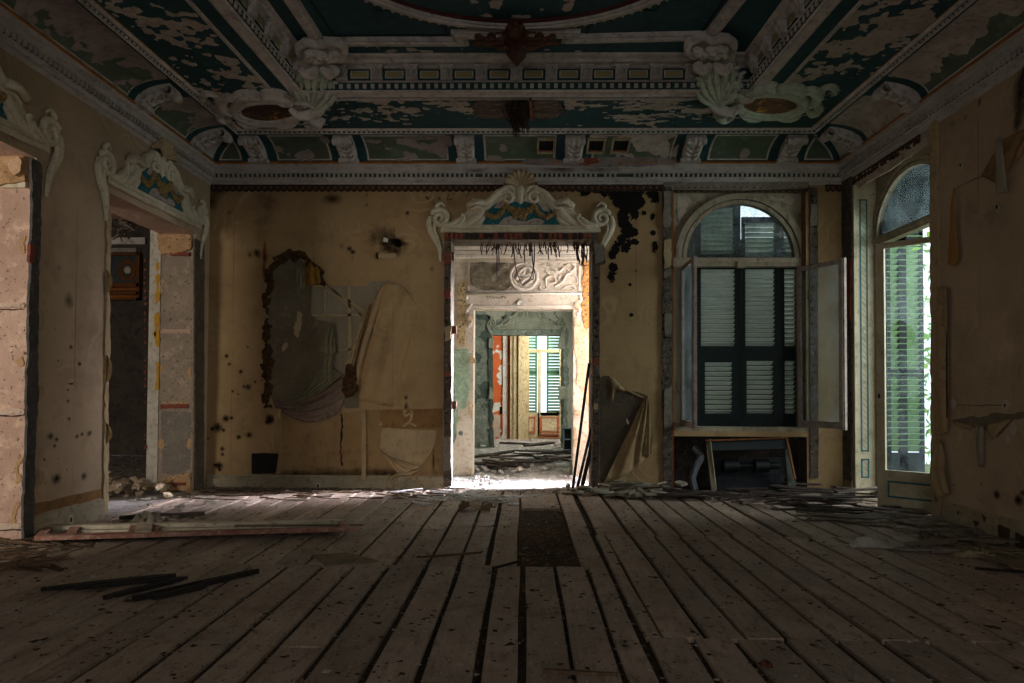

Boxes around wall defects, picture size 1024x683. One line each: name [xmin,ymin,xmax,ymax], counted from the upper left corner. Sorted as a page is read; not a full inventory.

peeling [14,0,266,95]
peeling [789,0,1024,85]
peeling [320,101,476,161]
peeling [521,100,716,168]
mould [550,184,660,283]